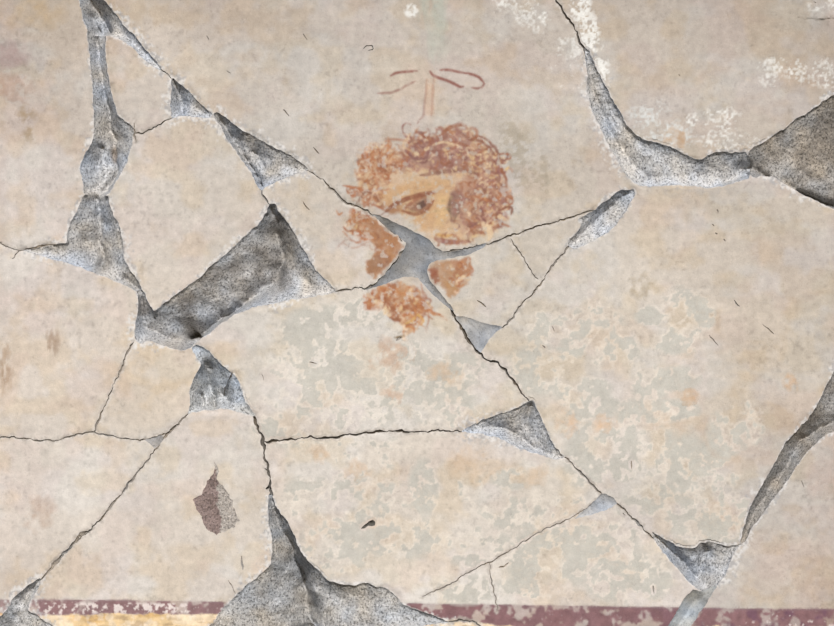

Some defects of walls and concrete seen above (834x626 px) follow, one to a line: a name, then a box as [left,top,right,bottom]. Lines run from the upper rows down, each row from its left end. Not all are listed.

crack [555,0,585,53]
spalling [568,48,834,249]
peeling [23,0,490,446]
crack [447,210,594,328]
crack [450,309,529,401]
spalling [0,578,53,626]
crack [0,342,188,580]
flaking render [193,462,240,535]
spalling [210,494,449,626]
crack [253,416,462,496]
crack [422,457,654,612]
peeling [432,288,834,608]